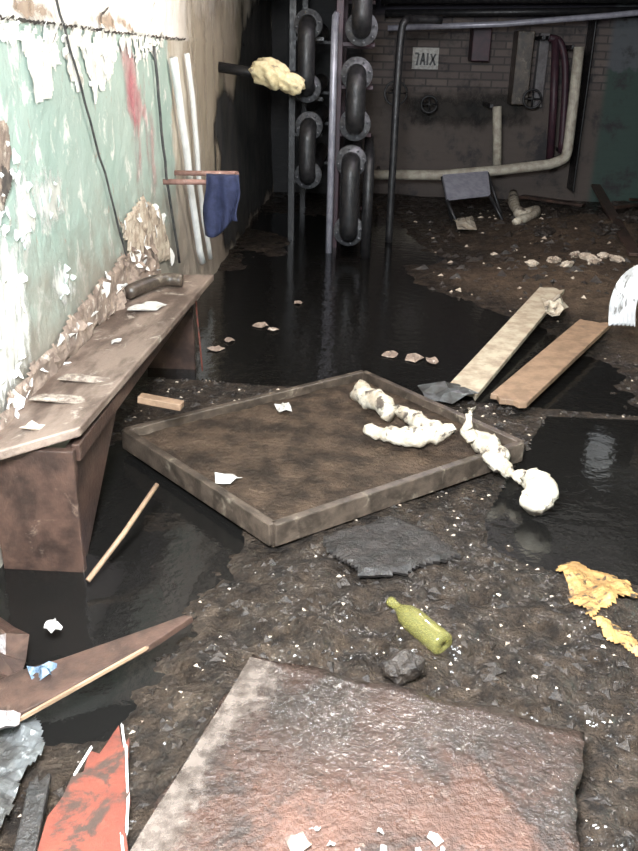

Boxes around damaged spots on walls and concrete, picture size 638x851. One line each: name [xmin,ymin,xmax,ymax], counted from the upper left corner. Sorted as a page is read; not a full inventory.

peeling [0,12,166,104]
spalling [0,120,175,430]